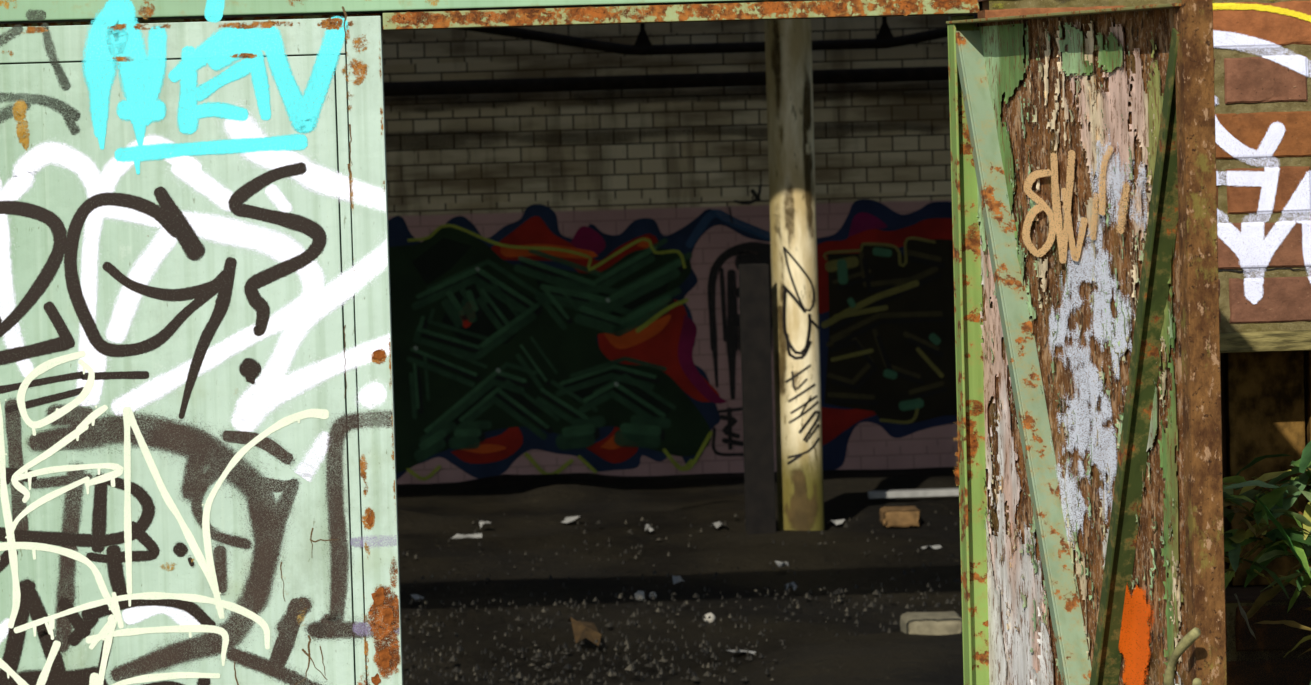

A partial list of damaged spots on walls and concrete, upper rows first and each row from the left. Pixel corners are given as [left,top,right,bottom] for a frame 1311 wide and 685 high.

rust [2,26,50,34]
rust [108,0,170,31]
rust [219,0,308,29]
rust [385,0,655,27]
rust [676,3,723,19]
rust [749,0,793,18]
rust [888,0,975,16]
rust [318,18,382,112]
peeling [973,17,1163,685]
rust [953,399,984,487]
peeling [1130,248,1183,685]
rust [357,454,401,685]